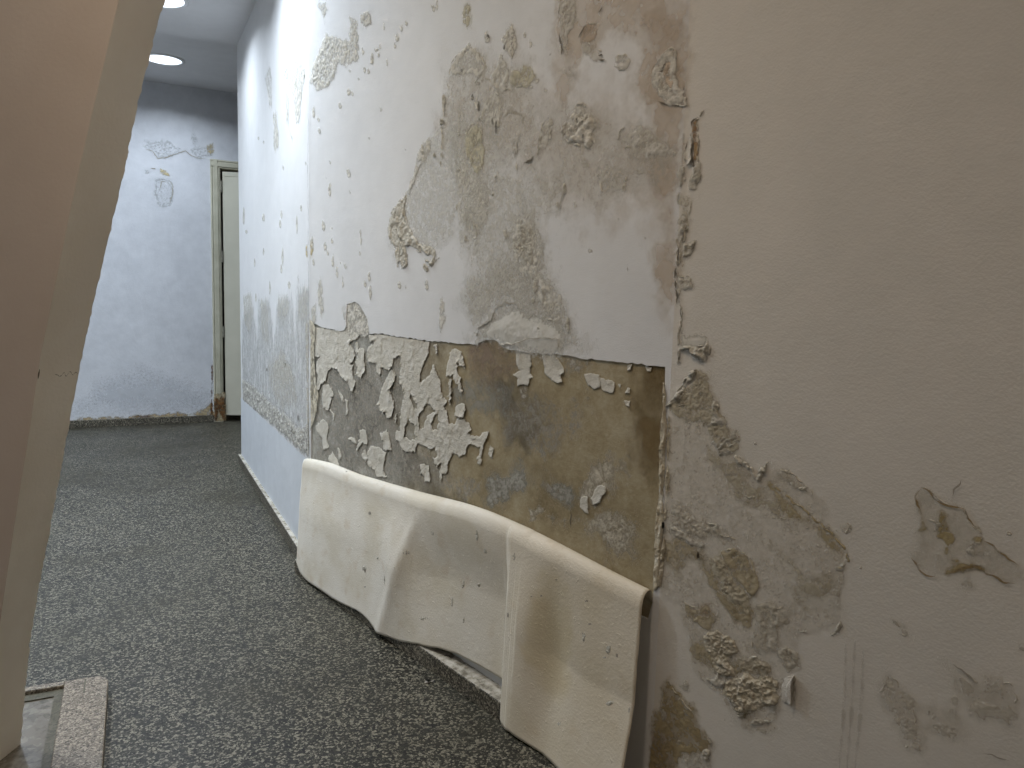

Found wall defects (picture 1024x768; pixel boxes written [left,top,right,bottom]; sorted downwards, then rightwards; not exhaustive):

spalling [651,47,687,107]
peeling [145,142,213,207]
water stain [452,134,569,335]
water stain [242,281,324,447]
spalling [312,273,861,733]
water stain [570,450,636,555]